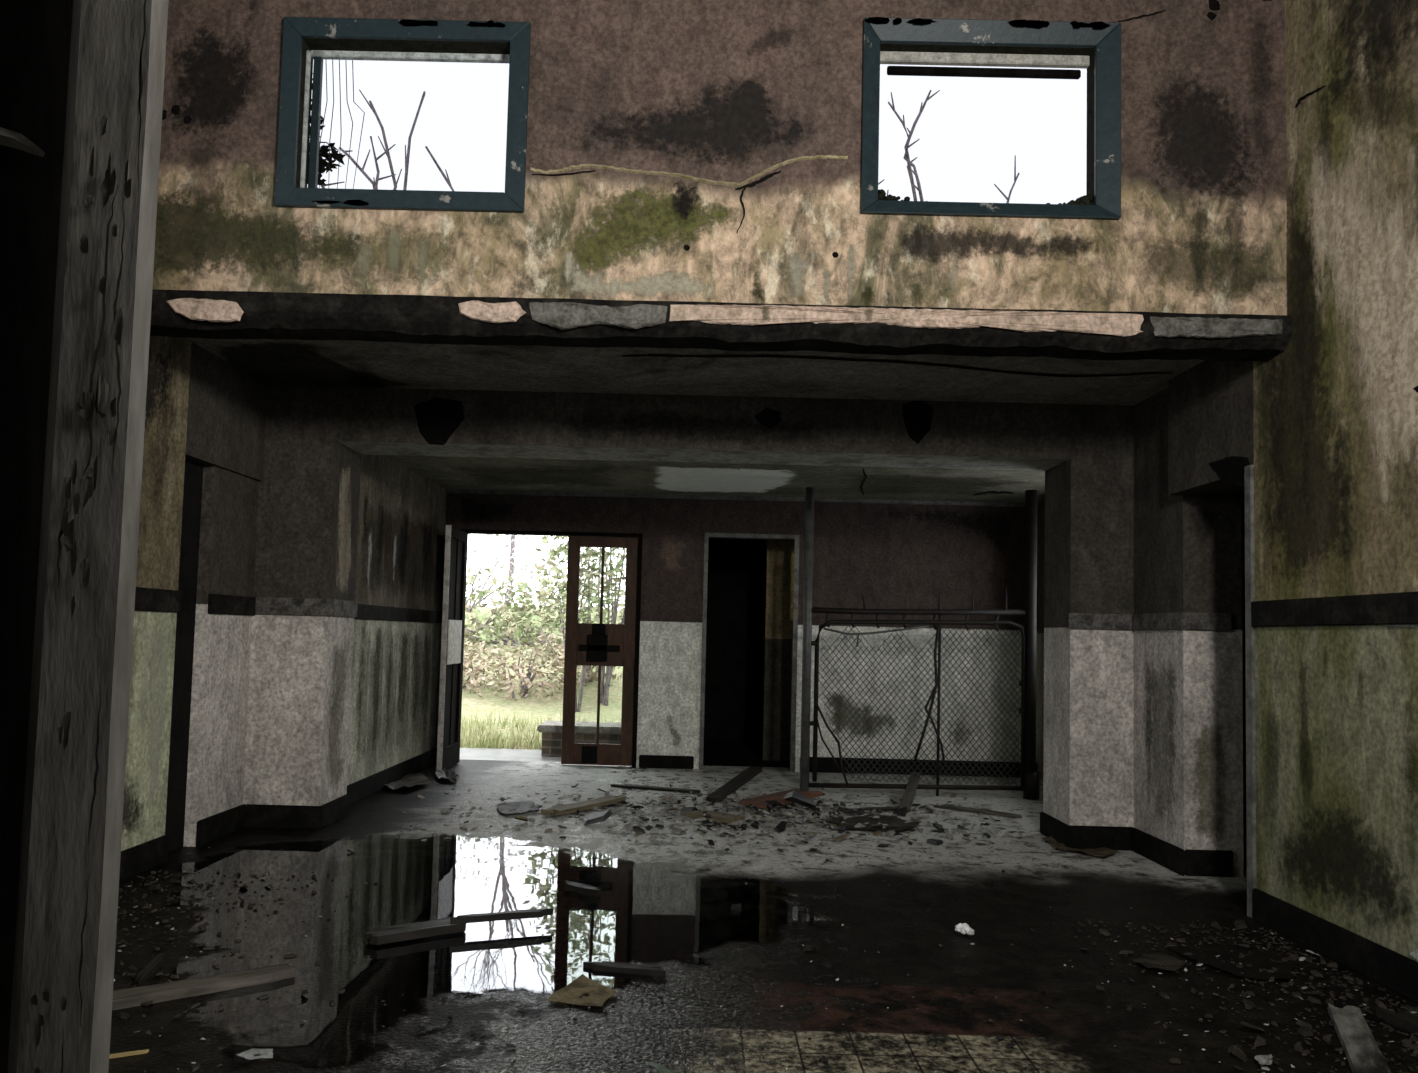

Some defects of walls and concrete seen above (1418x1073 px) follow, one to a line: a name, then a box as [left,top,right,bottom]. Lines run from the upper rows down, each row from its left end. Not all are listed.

water stain [175,28,253,131]
water stain [584,79,803,164]
water stain [1155,80,1255,196]
water stain [1328,0,1418,102]
water stain [673,182,699,219]
crack [530,155,848,233]
spalling [166,298,244,322]
spalling [458,300,1283,338]
water stain [1270,193,1348,572]
water stain [122,785,140,831]
water stain [1284,810,1407,924]